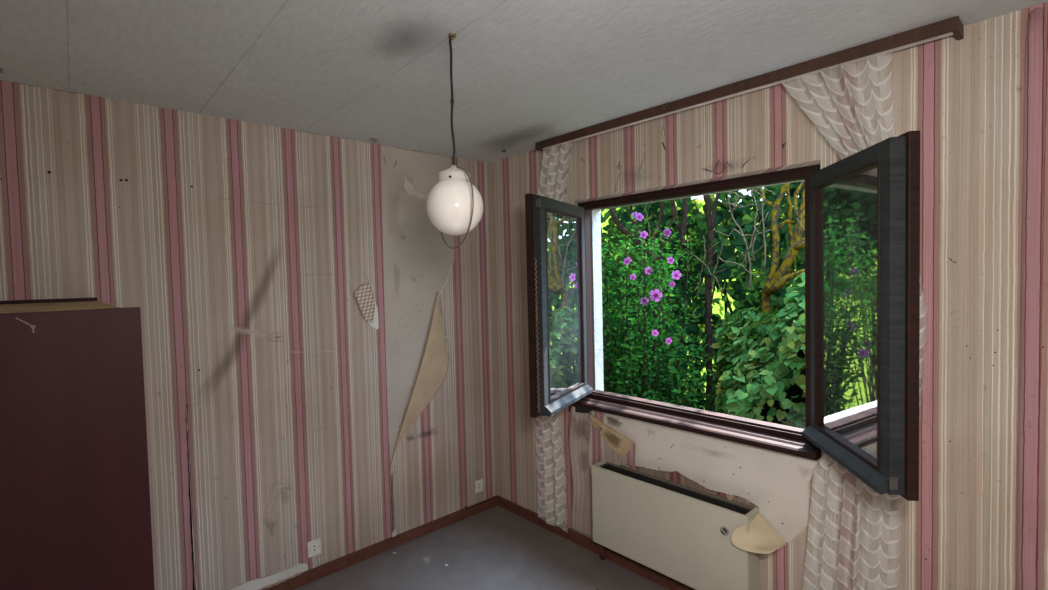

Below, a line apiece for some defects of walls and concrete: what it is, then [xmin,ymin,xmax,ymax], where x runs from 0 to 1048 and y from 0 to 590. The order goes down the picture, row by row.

flaking render [381,146,454,475]
flaking render [595,411,817,543]